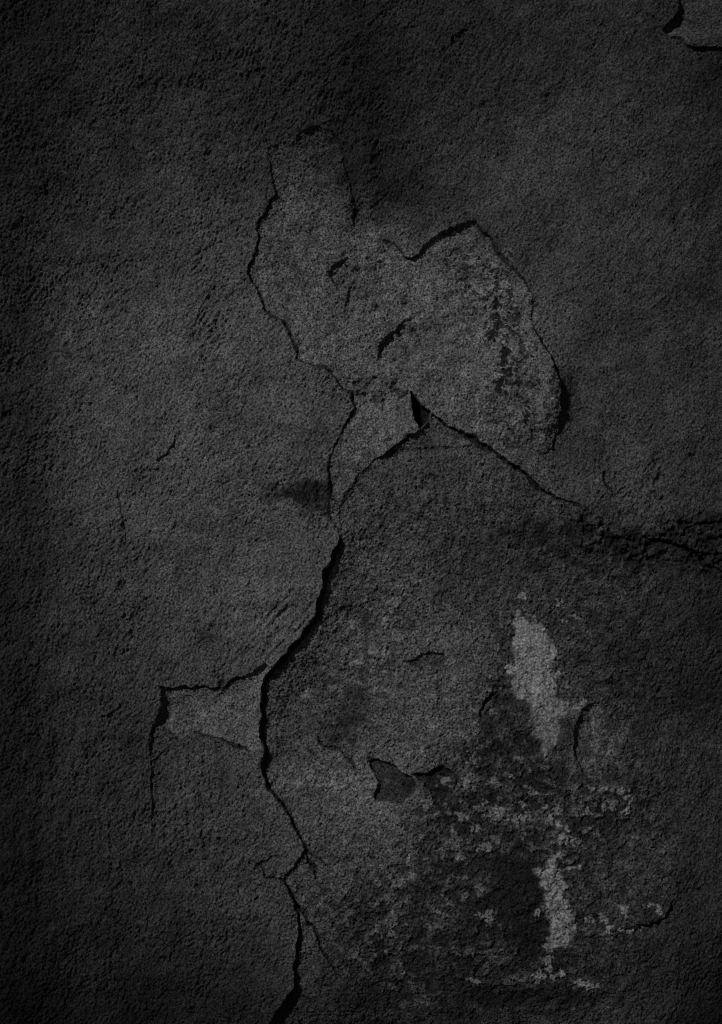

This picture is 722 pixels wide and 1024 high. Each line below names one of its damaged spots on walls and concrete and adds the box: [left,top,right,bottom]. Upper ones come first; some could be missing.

crack [327,128,358,225]
crack [662,0,722,52]
spalling [149,123,675,1024]
crack [155,146,722,1024]
leakage [293,490,722,1024]